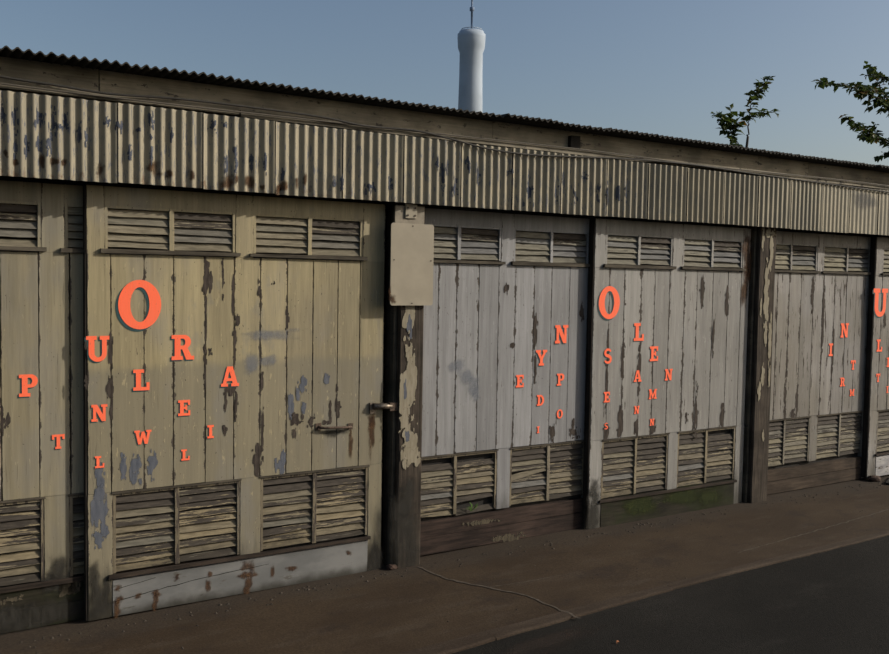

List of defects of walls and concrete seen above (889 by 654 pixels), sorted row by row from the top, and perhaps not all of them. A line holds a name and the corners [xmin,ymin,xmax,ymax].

peeling [1,103,88,160]
rust [39,155,67,168]
rust [221,176,265,189]
rust [276,174,307,195]
peeling [757,227,775,401]
peeling [288,375,315,439]
peeling [399,305,421,470]
peeling [120,449,158,485]
peeling [91,462,109,549]
rust [238,562,257,594]